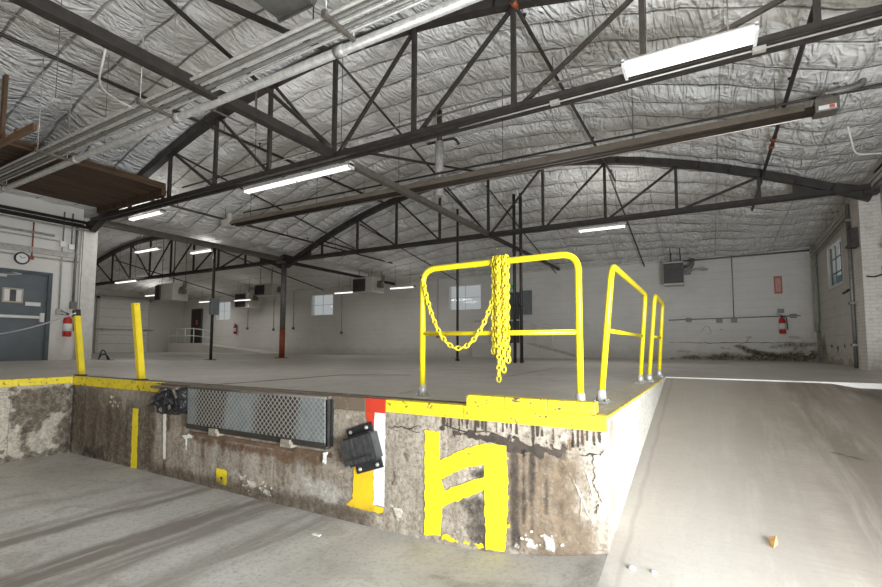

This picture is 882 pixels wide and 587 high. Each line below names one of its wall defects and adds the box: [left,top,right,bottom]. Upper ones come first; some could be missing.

leakage [9,384,368,526]
leakage [440,417,601,556]